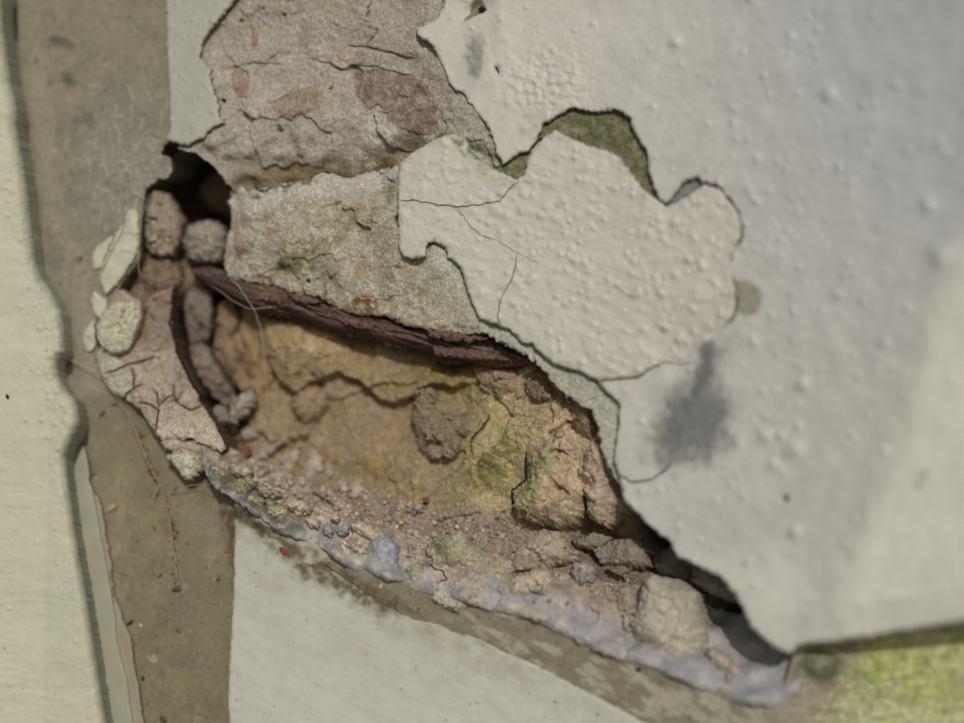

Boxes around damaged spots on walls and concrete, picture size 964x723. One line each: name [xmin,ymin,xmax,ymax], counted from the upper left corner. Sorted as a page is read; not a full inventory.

crack [107,289,223,430]
corrosion [191,265,535,369]
spalling [83,0,761,585]
crack [402,182,538,323]
damp [659,346,727,460]
spalling [690,583,744,613]